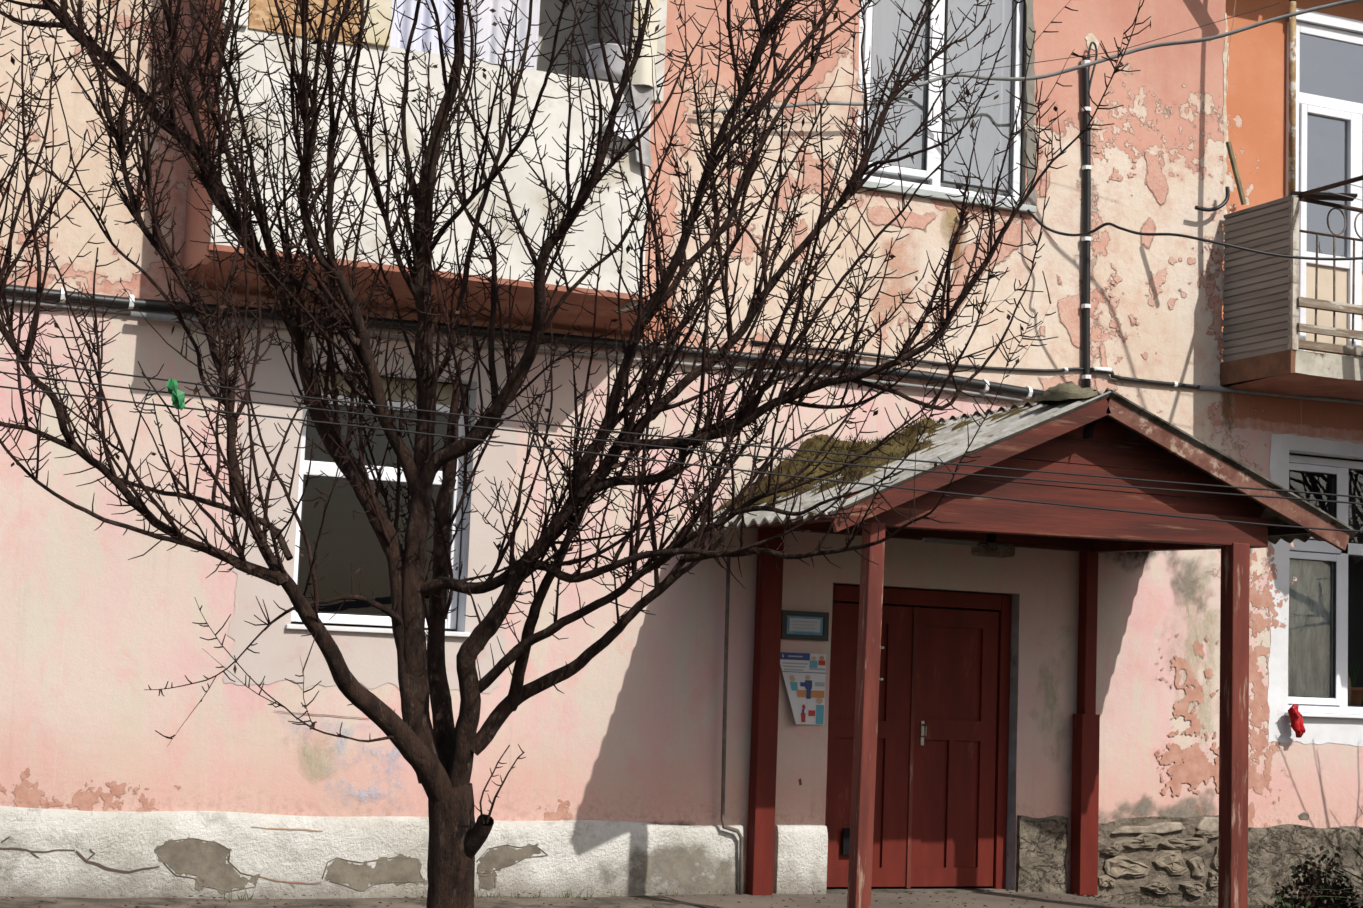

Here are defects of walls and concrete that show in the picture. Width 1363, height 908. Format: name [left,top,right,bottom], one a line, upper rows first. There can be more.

peeling [0,0,189,317]
peeling [664,13,1267,474]
peeling [1155,635,1219,816]
peeling [0,768,160,812]
crack [251,825,323,833]
crack [0,836,160,873]
flaking render [154,837,260,895]
flaking render [322,854,428,891]
flaking render [476,844,548,890]